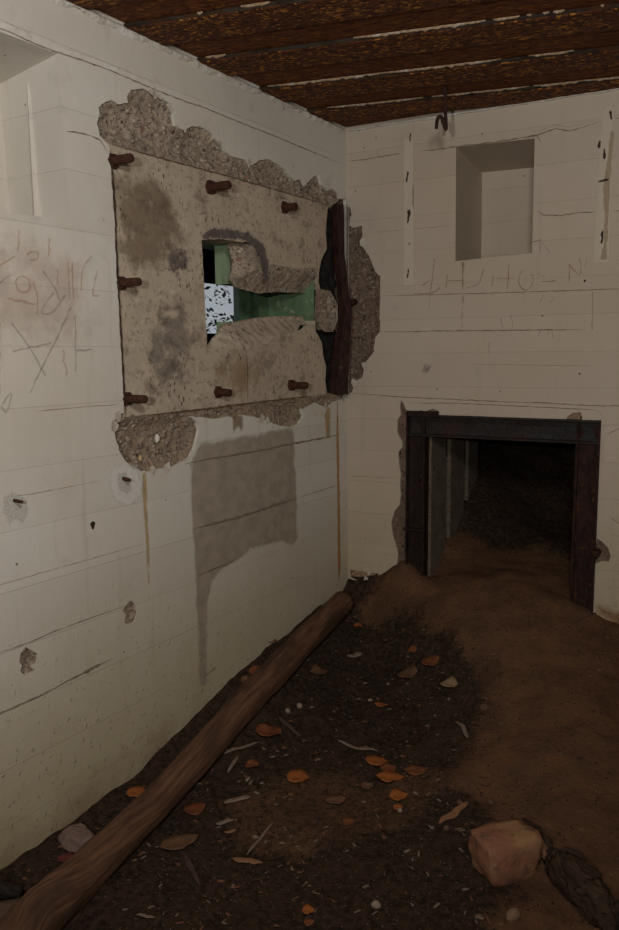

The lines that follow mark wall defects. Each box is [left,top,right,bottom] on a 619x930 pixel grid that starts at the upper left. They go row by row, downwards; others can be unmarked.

peeling [97,86,380,684]
rust [325,403,341,577]
spalling [392,402,407,562]
peeling [19,647,37,674]